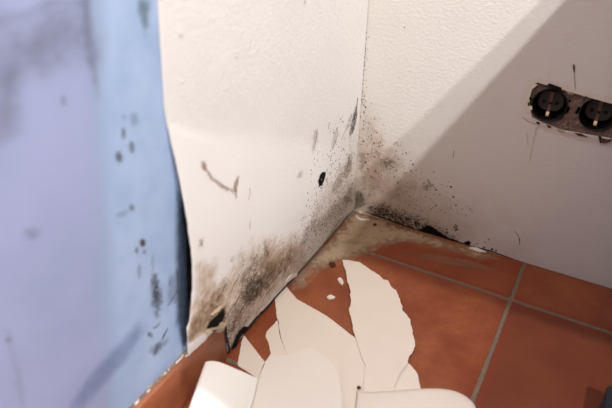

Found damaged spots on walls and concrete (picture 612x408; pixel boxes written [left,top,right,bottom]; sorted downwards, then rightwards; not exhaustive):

peeling [204,320,228,334]
damp [205,61,611,353]